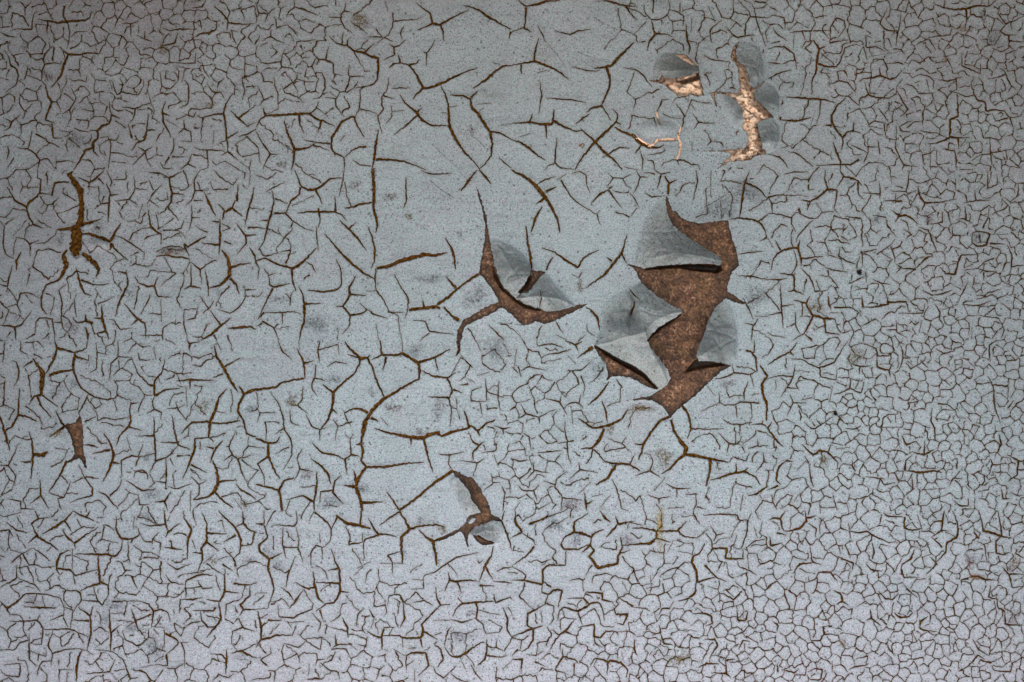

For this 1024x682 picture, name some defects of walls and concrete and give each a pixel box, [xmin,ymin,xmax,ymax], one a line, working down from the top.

spalling [651,40,781,167]
crack [0,0,479,682]
spalling [456,187,745,418]
crack [371,0,1024,682]
spalling [439,470,505,550]